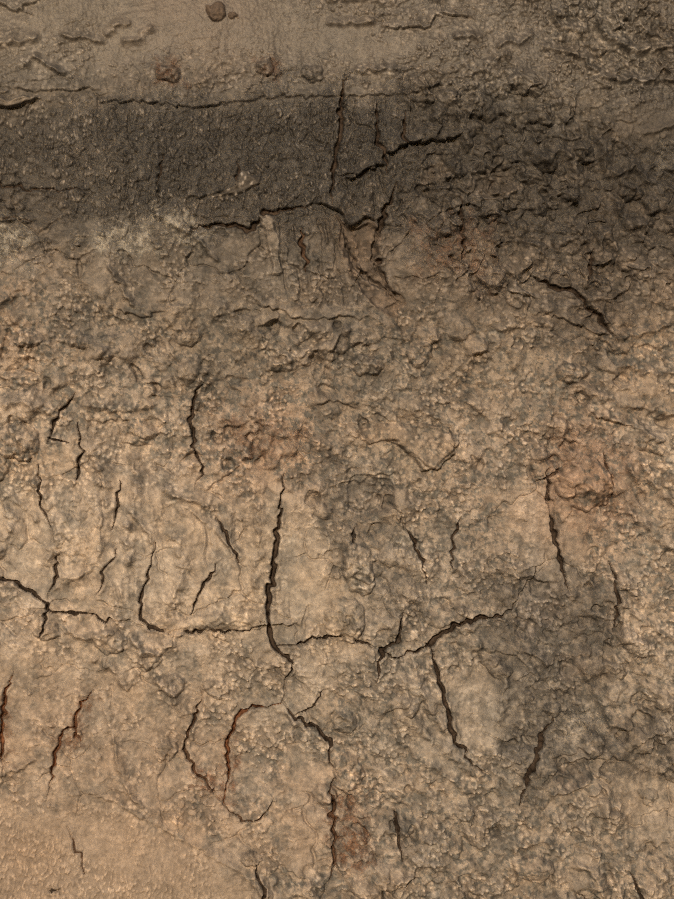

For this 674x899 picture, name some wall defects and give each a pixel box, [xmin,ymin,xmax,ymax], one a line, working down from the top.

flaking render [212,168,260,198]
flaking render [259,214,283,276]
spalling [334,215,407,318]
crack [47,392,85,480]
flaking render [344,422,455,516]
crack [535,468,568,588]
crack [0,556,112,638]
crack [138,475,516,772]
spalling [514,574,563,639]
crack [50,692,92,780]
crack [182,691,338,879]
spalling [551,746,596,794]